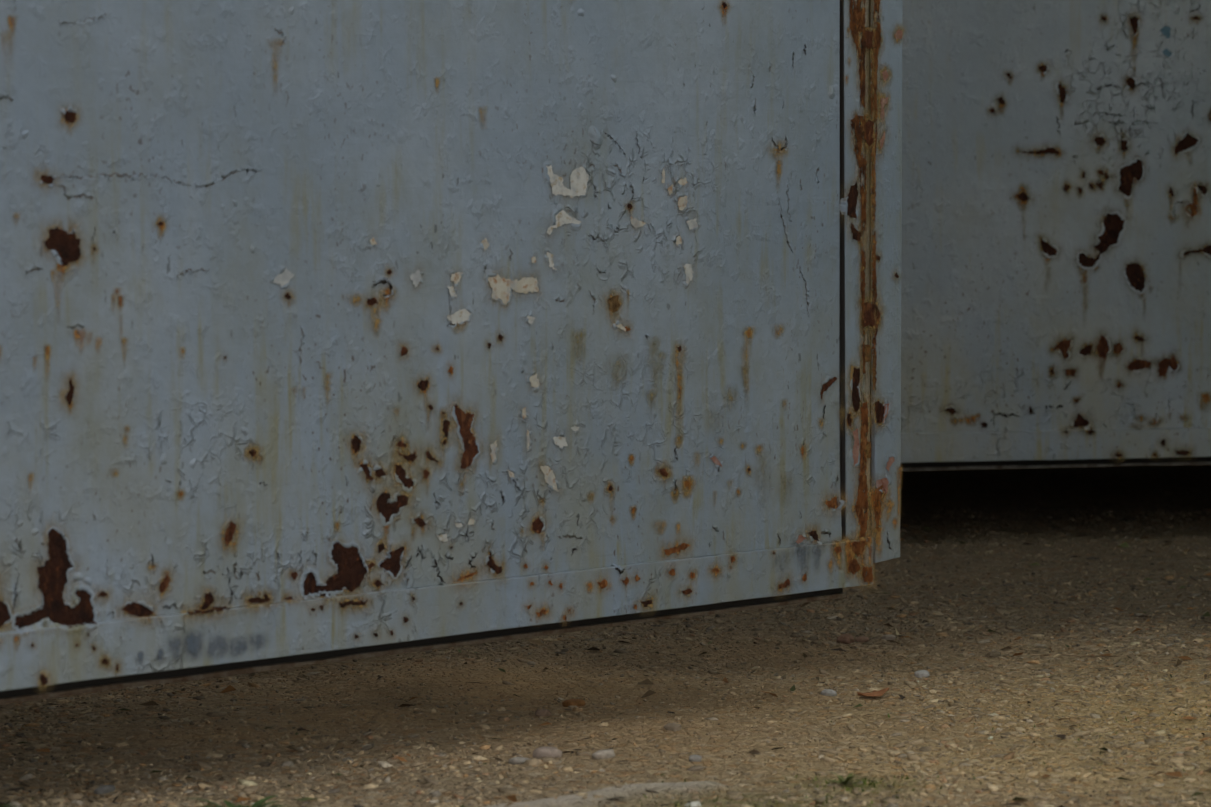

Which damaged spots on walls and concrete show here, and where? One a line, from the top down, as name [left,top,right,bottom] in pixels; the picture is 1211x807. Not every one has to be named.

corrosion [43,225,97,281]
peeling [658,164,701,249]
corrosion [806,0,904,586]
corrosion [1039,236,1060,262]
corrosion [1062,133,1148,308]
corrosion [222,521,238,550]
corrosion [245,377,482,612]
corrosion [0,525,120,673]
corrosion [122,571,172,622]